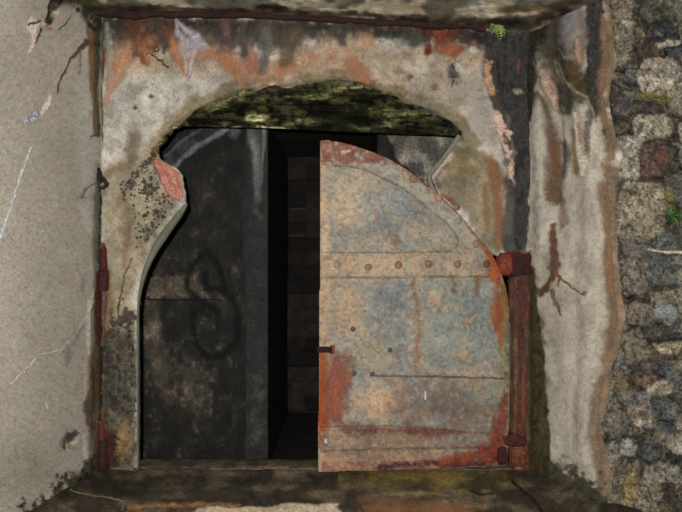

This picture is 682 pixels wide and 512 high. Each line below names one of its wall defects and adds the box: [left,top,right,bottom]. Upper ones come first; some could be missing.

crack [12,39,90,133]
rust [102,23,190,106]
rust [196,34,373,86]
rust [425,29,465,58]
flaking render [482,59,495,95]
spalling [120,79,462,248]
flaking render [492,110,515,184]
leakage [483,26,547,253]
rust [440,92,578,471]
rust [318,353,351,444]